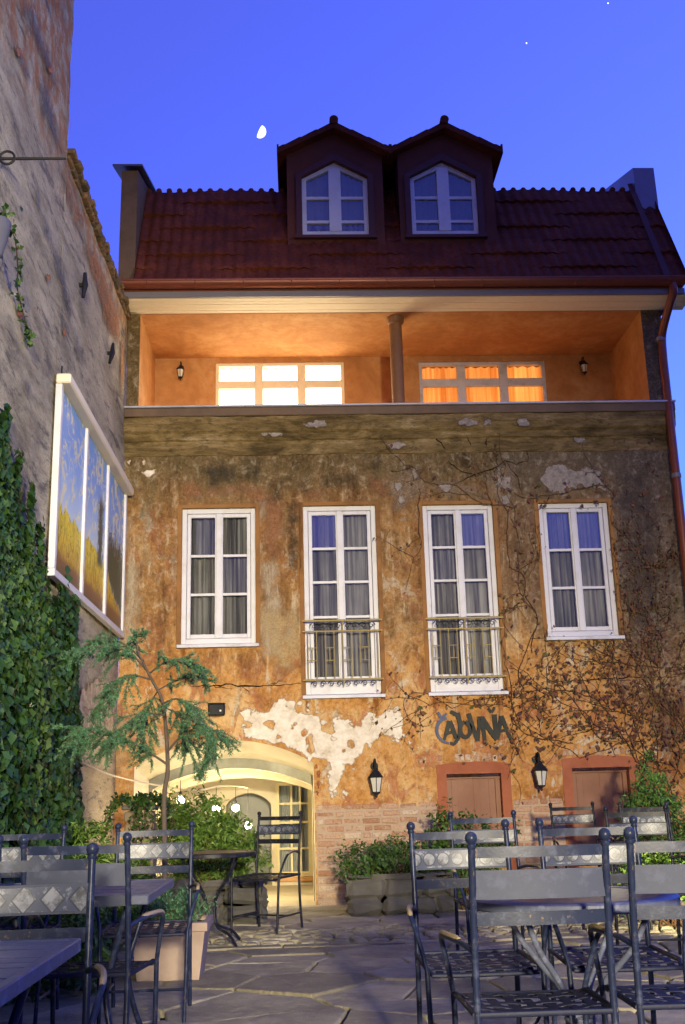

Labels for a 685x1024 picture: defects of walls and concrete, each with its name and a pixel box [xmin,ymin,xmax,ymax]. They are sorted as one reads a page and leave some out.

peeling [303,420,328,429]
peeling [458,417,492,427]
peeling [388,441,412,450]
spalling [540,464,609,495]
crack [192,681,301,691]
spalling [238,695,438,905]